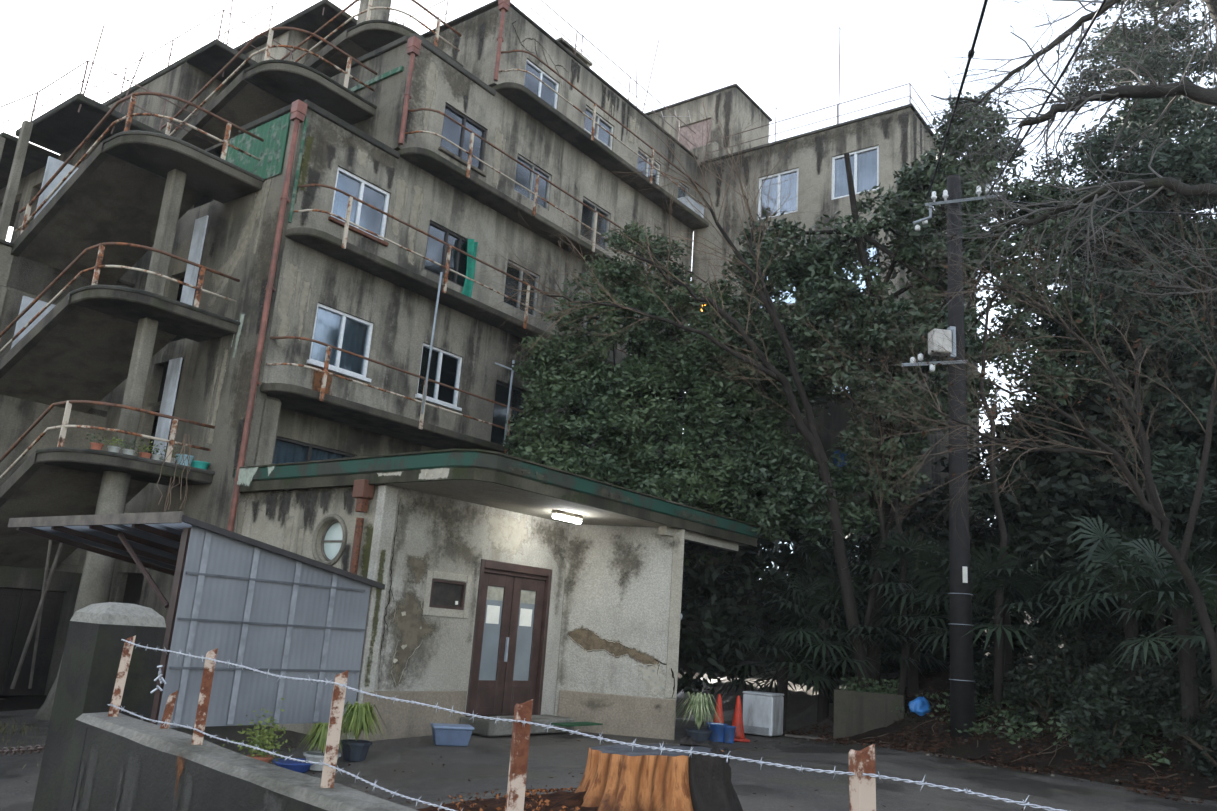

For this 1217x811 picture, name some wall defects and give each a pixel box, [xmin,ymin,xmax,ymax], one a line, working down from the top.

water stain [570,59,581,90]
water stain [601,85,640,143]
water stain [493,129,506,185]
water stain [701,90,922,207]
corrosion [312,366,333,395]
water stain [236,488,354,555]
water stain [407,555,429,583]
water stain [536,523,592,578]
water stain [612,543,642,586]
peeling [567,626,660,668]